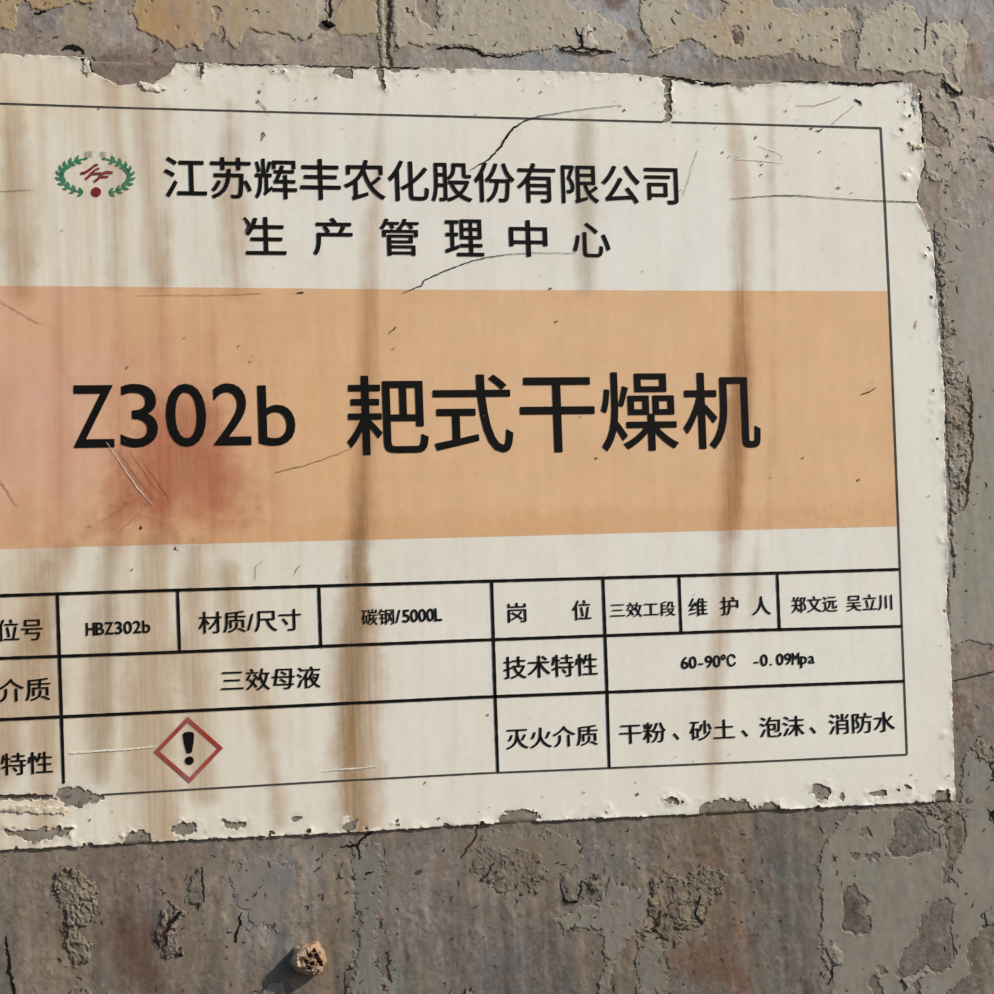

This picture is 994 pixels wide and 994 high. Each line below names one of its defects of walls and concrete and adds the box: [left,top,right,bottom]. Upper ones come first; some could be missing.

peeling [127,0,320,51]
peeling [392,0,629,56]
peeling [637,0,994,183]
crack [916,92,985,293]
peeling [933,216,994,650]
peeling [228,856,306,933]
crack [305,831,399,994]
peeling [342,839,390,994]
peeling [476,827,715,994]
crack [442,825,764,994]
peeling [816,749,994,994]
crack [927,736,994,919]